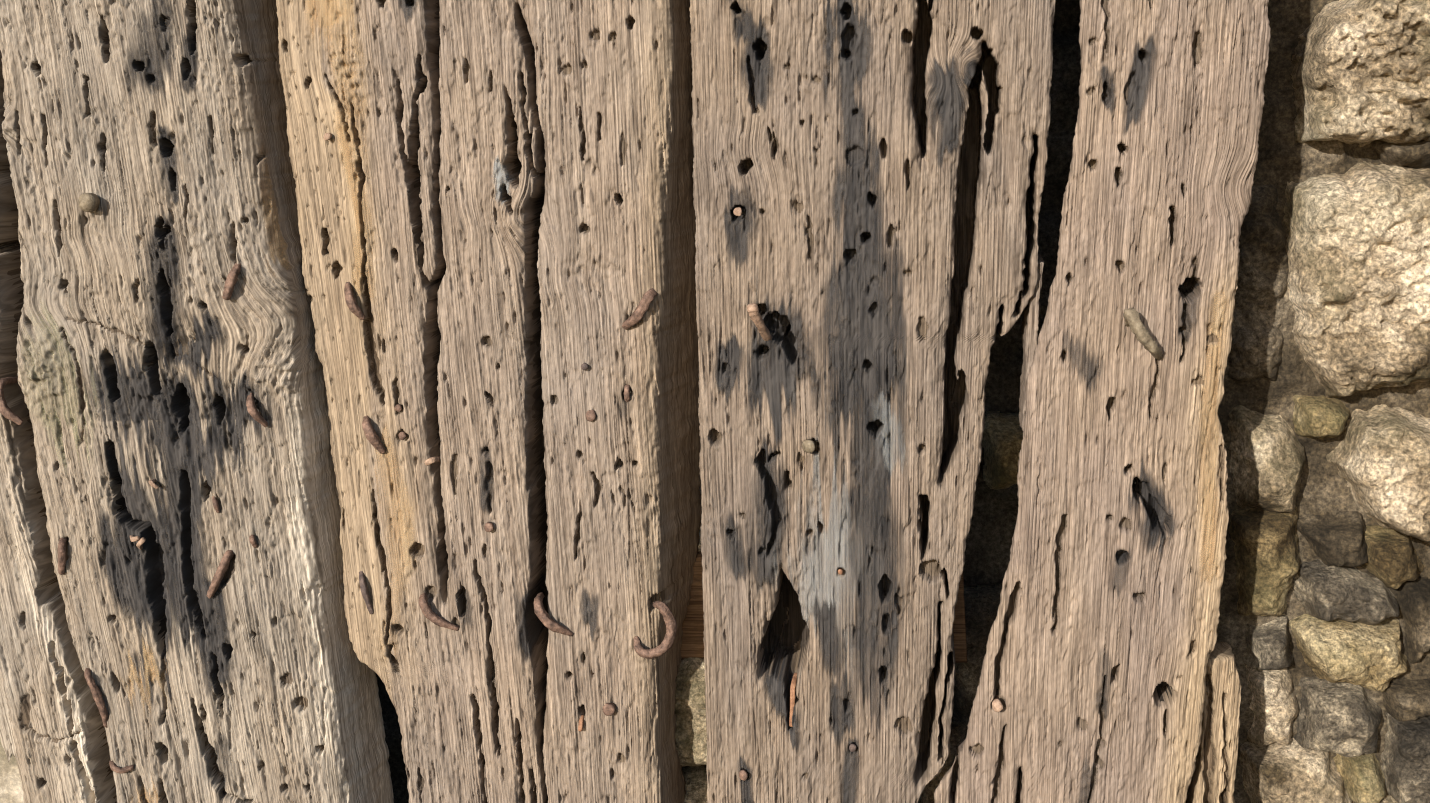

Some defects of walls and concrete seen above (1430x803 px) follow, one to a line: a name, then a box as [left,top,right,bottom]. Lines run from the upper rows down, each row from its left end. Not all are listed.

crack [913,0,933,154]
crack [995,135,1036,336]
crack [0,164,49,536]
crack [61,318,218,443]
crack [508,111,603,585]
crack [917,42,1000,803]
crack [19,694,168,803]
crack [444,555,549,803]
crack [992,731,1022,803]
crack [995,581,1021,692]
crack [1052,514,1067,629]
crack [1087,691,1105,803]